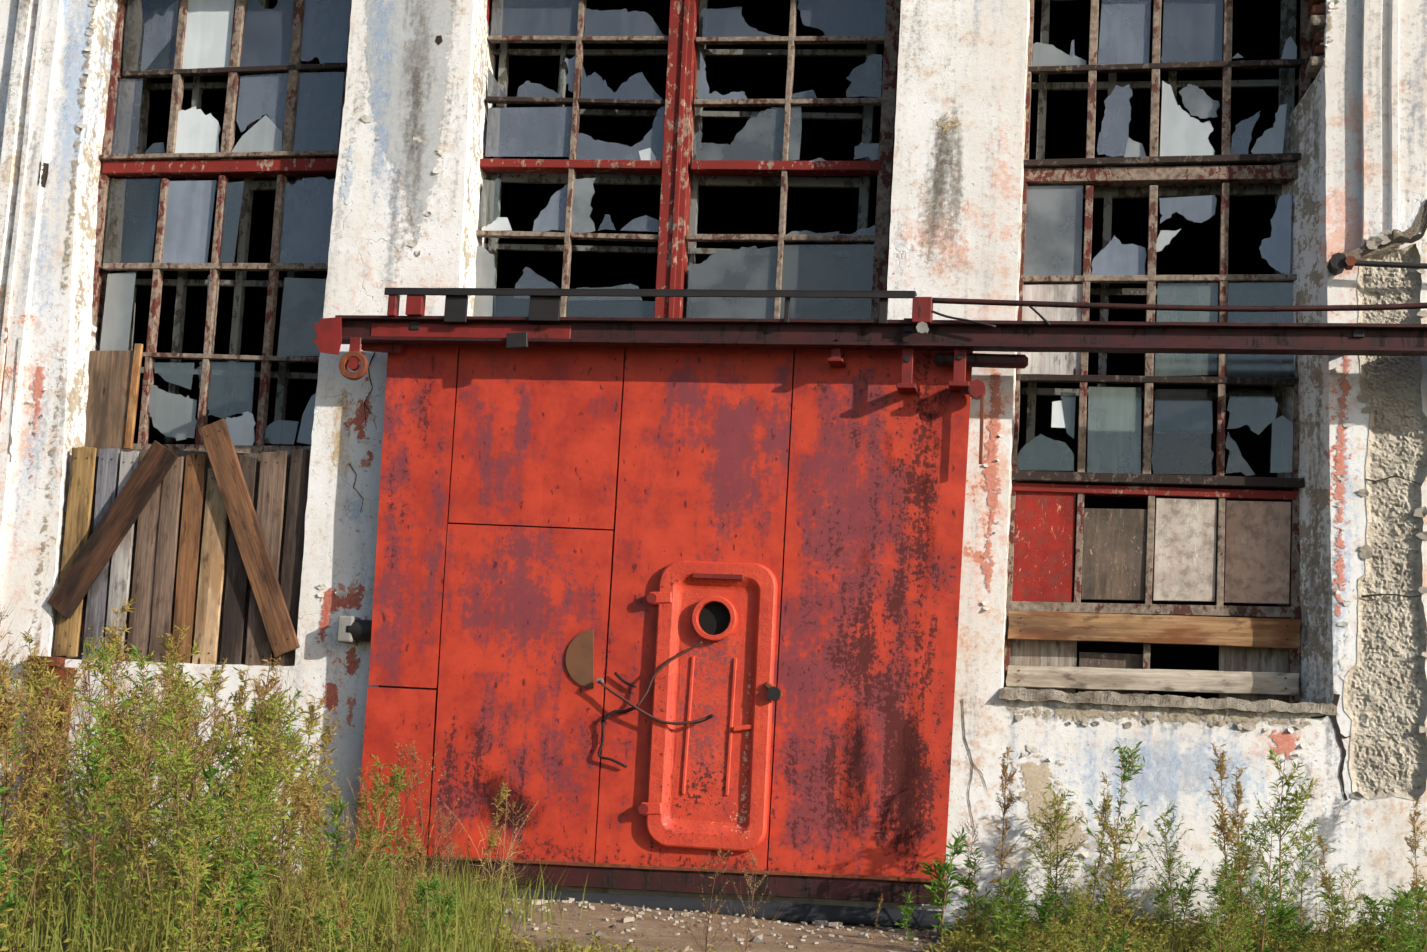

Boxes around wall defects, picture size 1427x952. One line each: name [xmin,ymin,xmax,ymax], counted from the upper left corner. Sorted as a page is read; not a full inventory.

damp [377,0,428,182]
damp [935,113,962,195]
spalling [1342,199,1427,324]
peeling [981,373,1007,610]
spalling [1332,355,1427,801]
peeling [315,583,370,728]
rust [478,769,544,830]
rust [844,709,870,830]
crack [1311,694,1351,801]